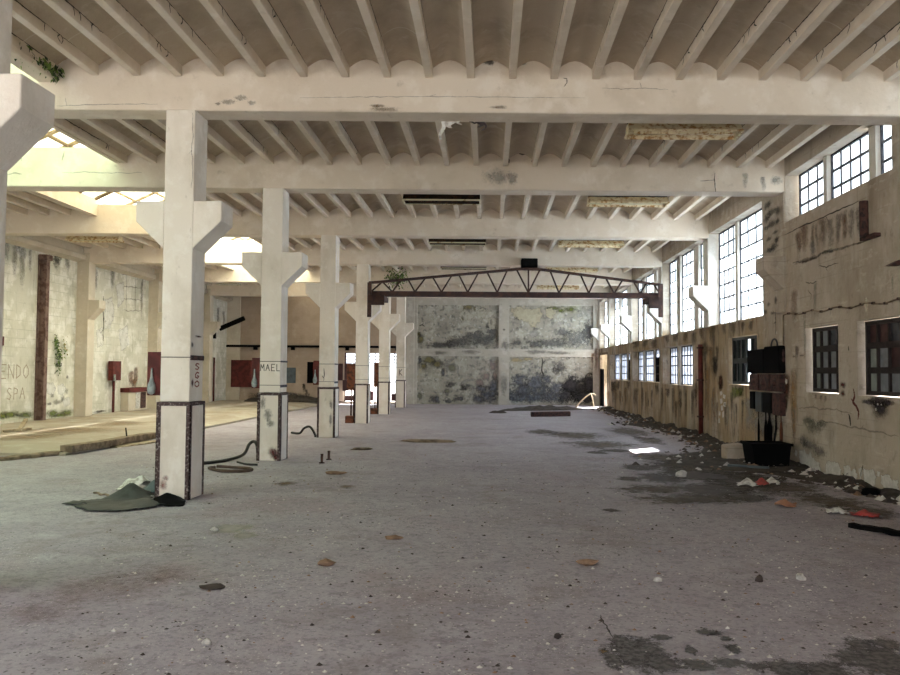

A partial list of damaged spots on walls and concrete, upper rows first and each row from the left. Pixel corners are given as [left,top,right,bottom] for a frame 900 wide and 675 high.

leakage [794,211,866,263]
leakage [417,320,593,404]
leakage [724,393,775,434]
crack [848,389,859,426]